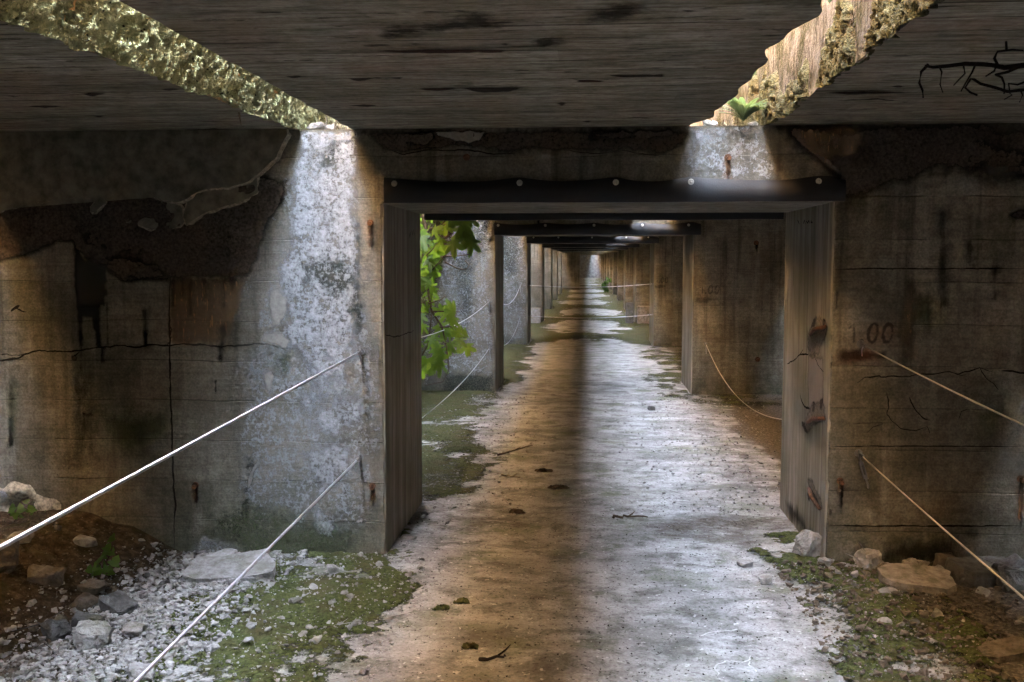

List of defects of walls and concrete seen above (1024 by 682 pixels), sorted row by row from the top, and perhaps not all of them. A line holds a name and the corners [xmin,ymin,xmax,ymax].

flaking render [0,128,291,282]
water stain [74,248,108,363]
crack [0,277,326,548]
water stain [170,131,380,554]
crack [831,367,1024,447]